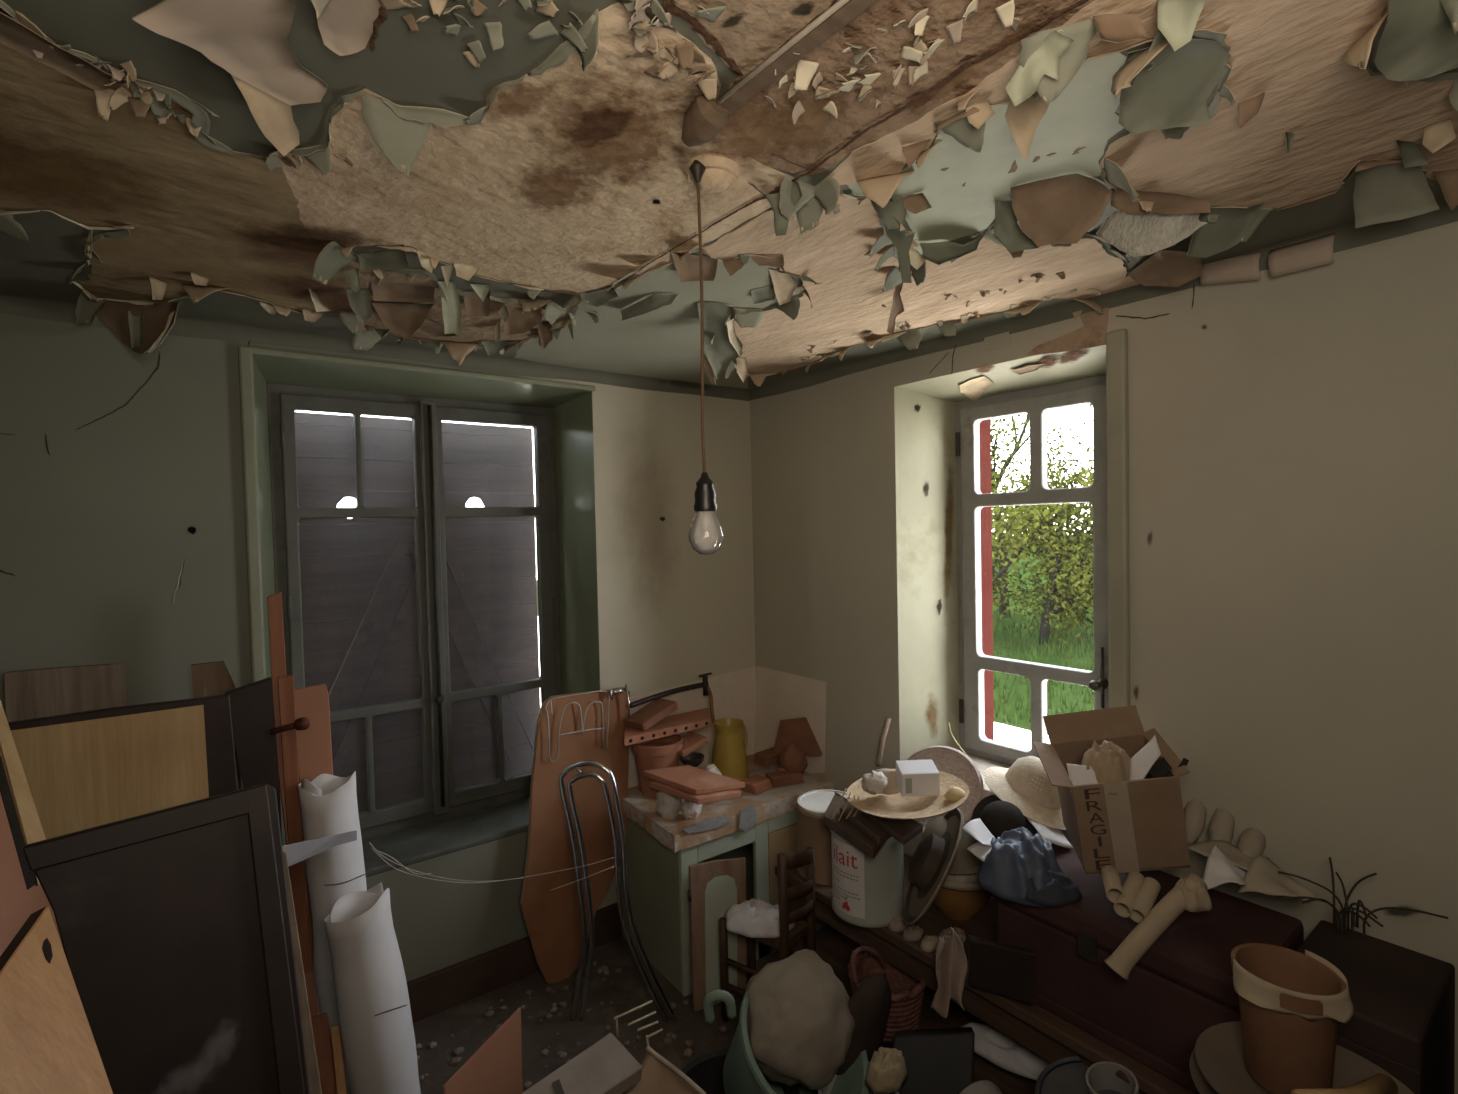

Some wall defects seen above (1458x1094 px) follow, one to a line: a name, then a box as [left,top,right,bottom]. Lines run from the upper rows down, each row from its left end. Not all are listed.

crack [369,6,388,52]
peeling [0,0,1458,401]
crack [503,0,1089,296]
crack [0,352,160,455]